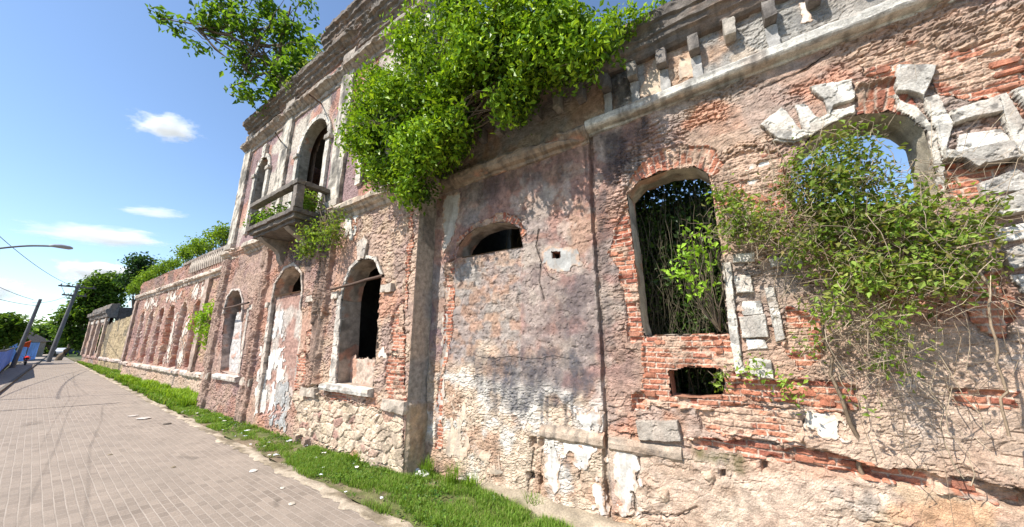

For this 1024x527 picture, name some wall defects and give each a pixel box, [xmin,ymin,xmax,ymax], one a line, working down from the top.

spalling [854,25,1024,116]
spalling [254,210,415,474]
spalling [607,144,1021,505]
peeling [537,433,644,519]